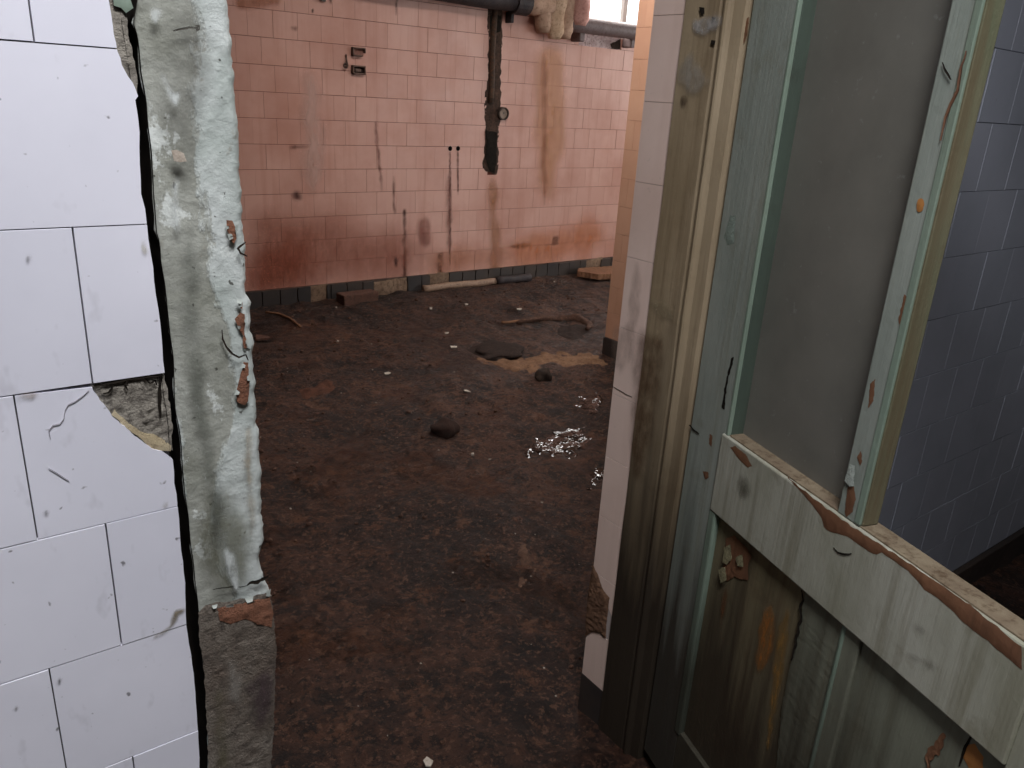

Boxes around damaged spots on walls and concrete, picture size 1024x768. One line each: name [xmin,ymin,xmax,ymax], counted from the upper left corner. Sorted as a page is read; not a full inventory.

peeling [226,220,239,244]
leakage [438,153,459,272]
spalling [92,373,173,451]
crack [120,0,269,768]
peeling [235,299,252,405]
peeling [718,545,743,583]
peeling [788,451,1022,670]
spalling [198,589,277,768]
crack [791,590,804,661]